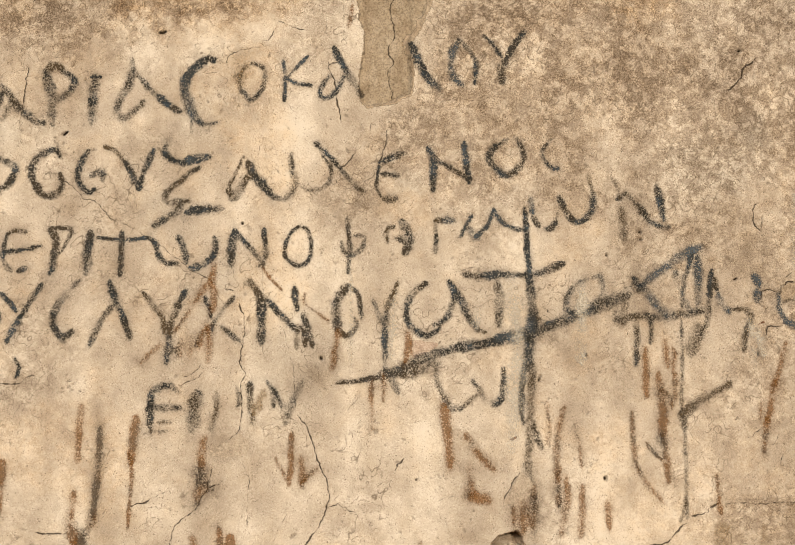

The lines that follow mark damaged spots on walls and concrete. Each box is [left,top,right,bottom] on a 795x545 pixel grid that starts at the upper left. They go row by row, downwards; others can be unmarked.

spalling [357,0,432,109]
crack [146,236,246,439]
crack [299,417,352,545]
spalling [491,530,526,545]